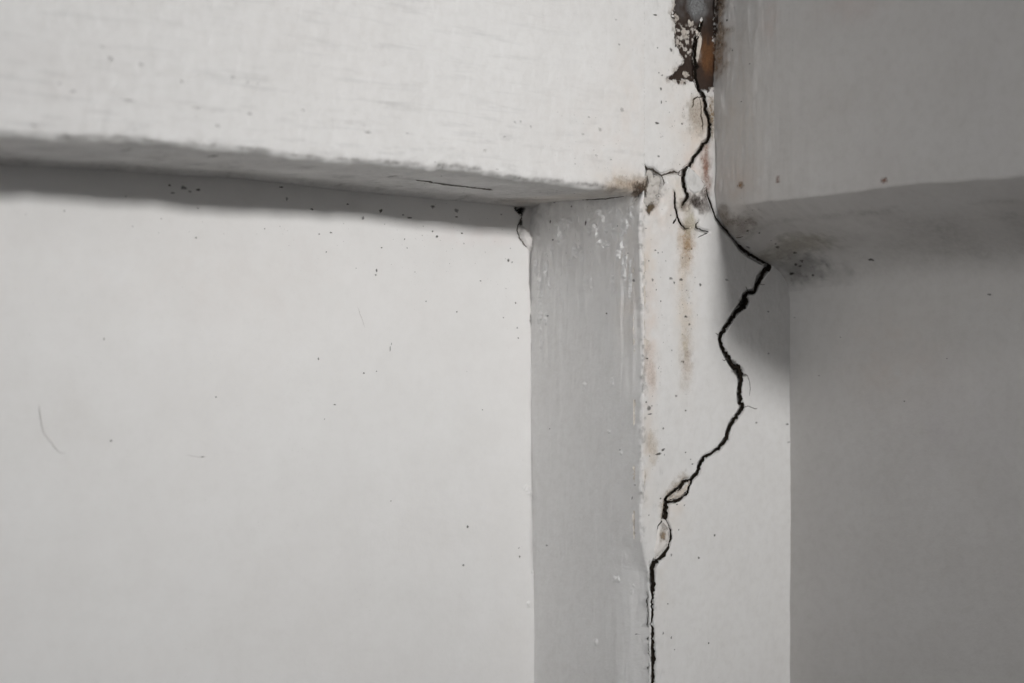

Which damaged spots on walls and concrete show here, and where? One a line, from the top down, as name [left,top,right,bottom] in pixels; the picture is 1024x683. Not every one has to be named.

spalling [669,0,727,93]
crack [644,20,771,683]